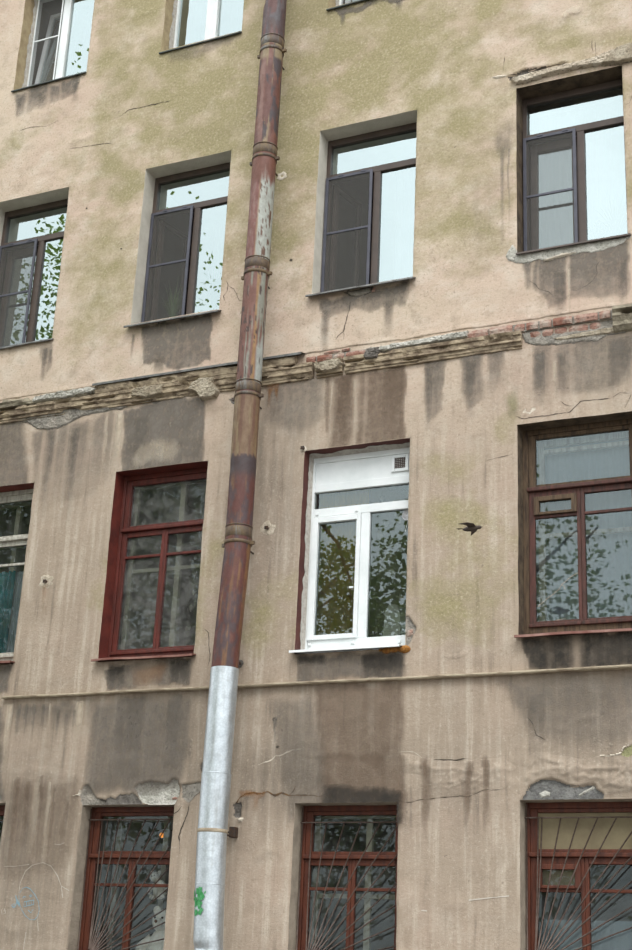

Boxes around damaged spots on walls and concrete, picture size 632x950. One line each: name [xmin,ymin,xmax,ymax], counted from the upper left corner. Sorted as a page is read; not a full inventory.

peeling [492,43,632,85]
flaking render [306,310,629,376]
water stain [462,352,502,387]
water stain [535,352,545,379]
water stain [326,367,406,447]
crack [516,392,631,419]
water stain [116,398,205,471]
water stain [298,652,405,823]
spalling [73,762,203,806]
spalling [523,780,604,800]
crack [172,792,200,854]